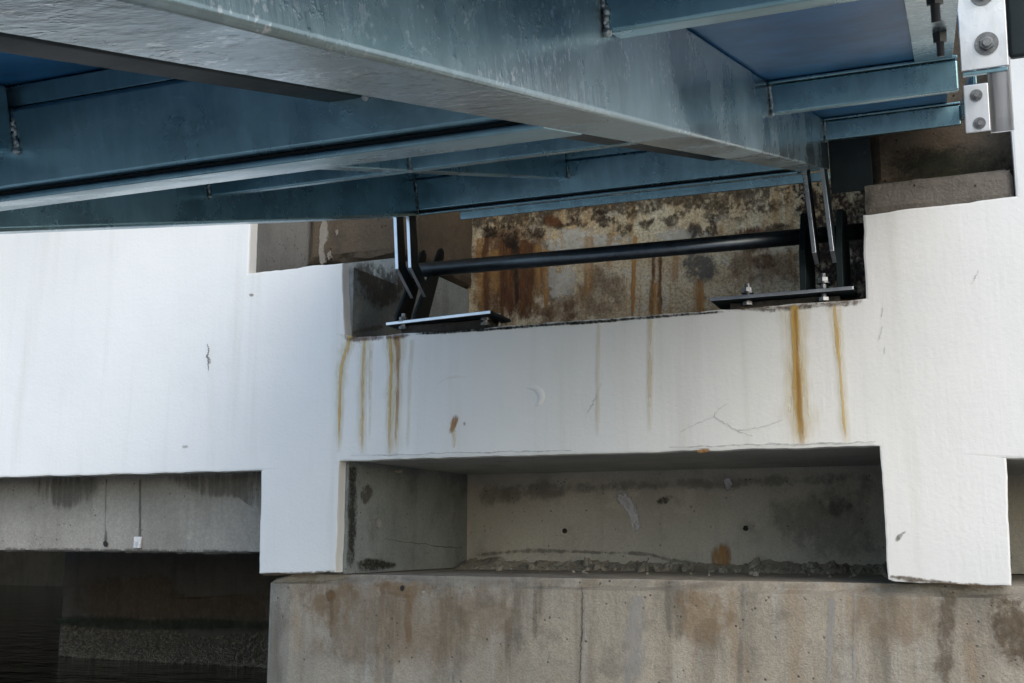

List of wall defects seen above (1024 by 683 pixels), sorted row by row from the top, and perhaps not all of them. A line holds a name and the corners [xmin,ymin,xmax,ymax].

rust [478,227,548,258]
rust [474,267,574,325]
rust [650,257,662,314]
rust [338,333,404,429]
rust [791,305,801,428]
leakage [38,480,248,554]
spalling [455,557,888,578]
leakage [991,598,1024,661]